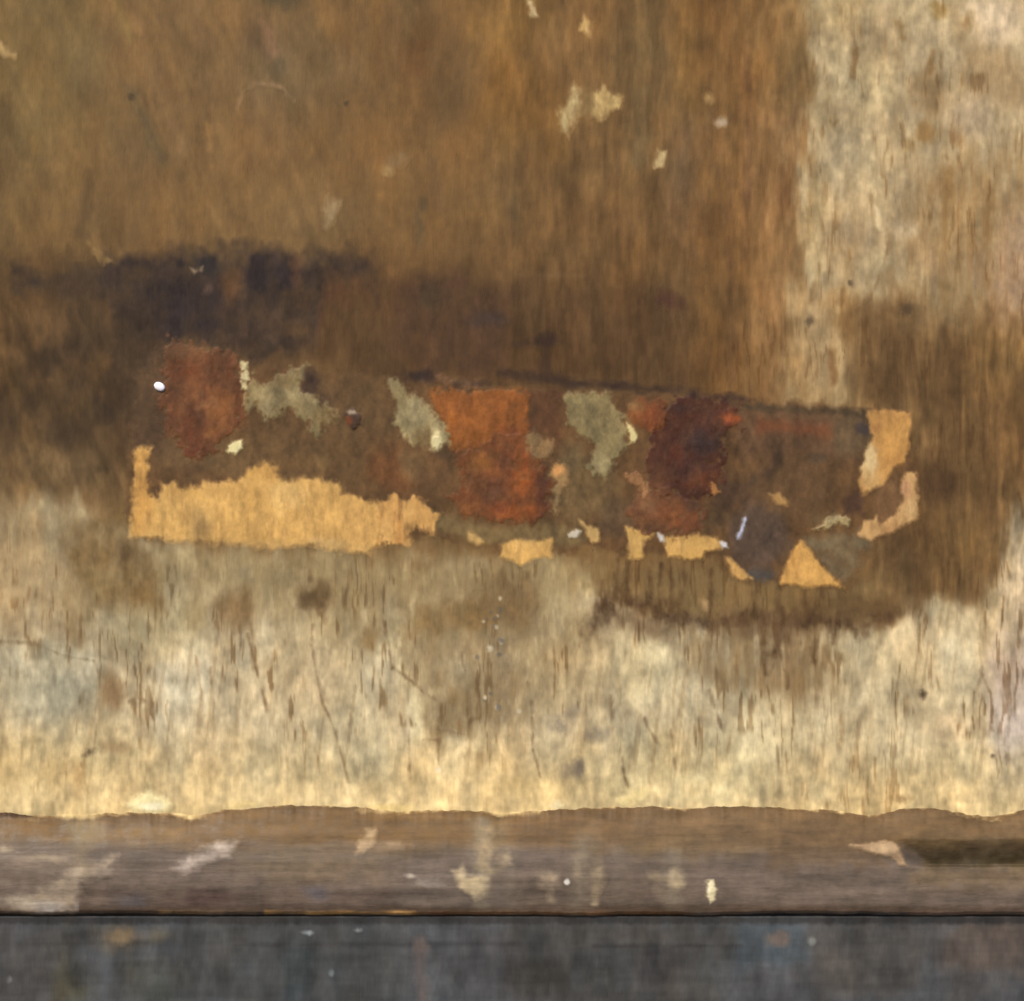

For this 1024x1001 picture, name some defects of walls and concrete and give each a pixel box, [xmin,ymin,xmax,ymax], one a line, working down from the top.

water stain [0,228,519,479]
water stain [571,282,1024,679]
water stain [56,491,171,619]
water stain [209,579,261,673]
water stain [289,548,340,626]
water stain [397,567,552,646]
water stain [99,663,129,718]
water stain [96,736,135,758]
water stain [417,683,505,769]
water stain [539,701,613,784]